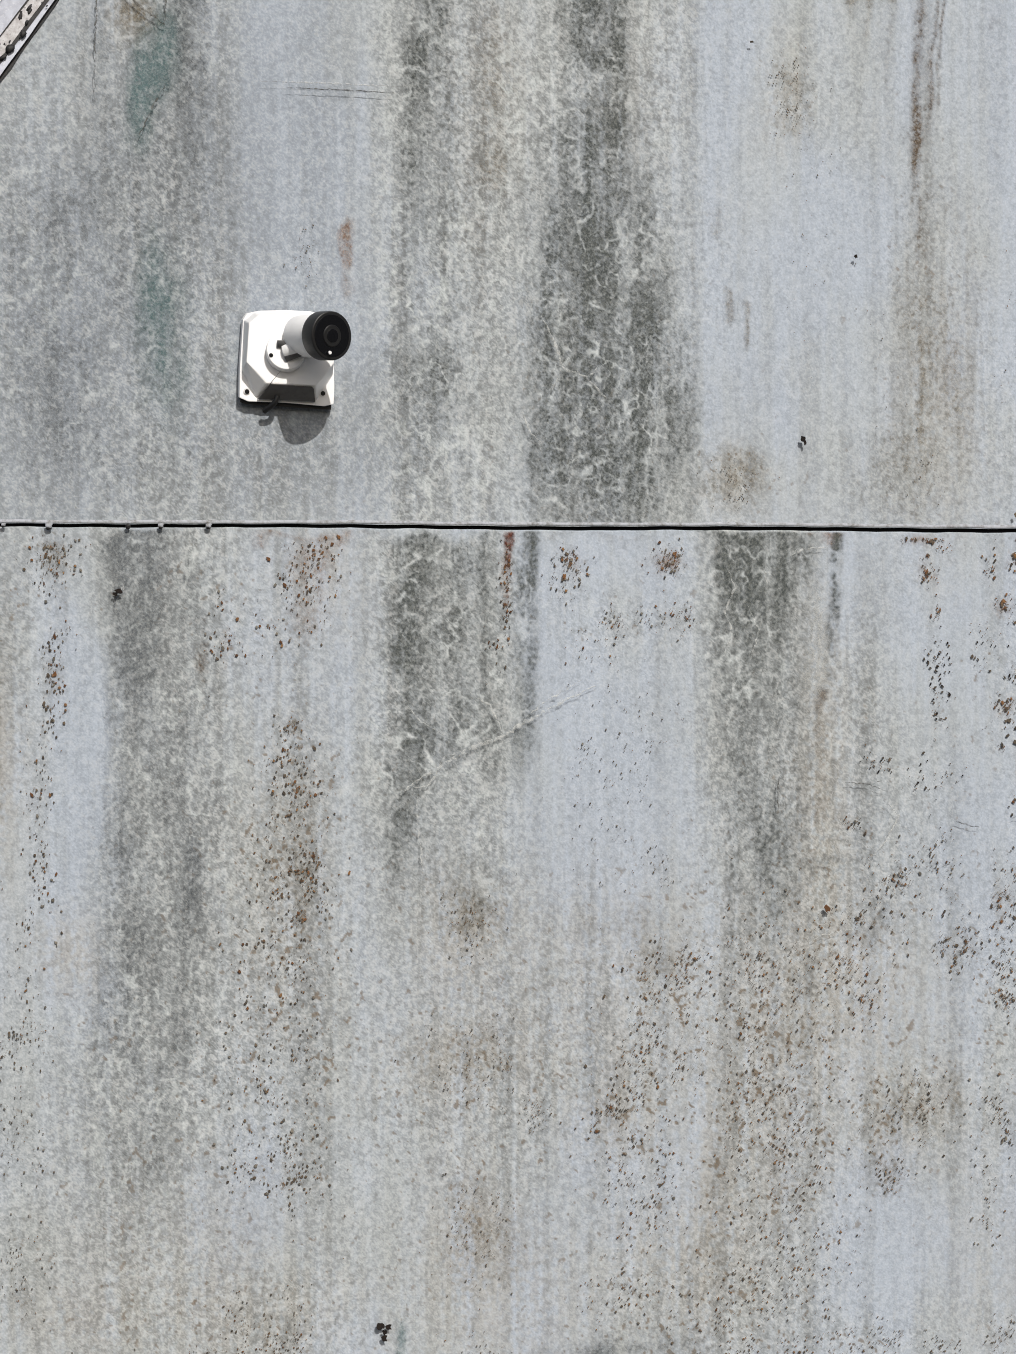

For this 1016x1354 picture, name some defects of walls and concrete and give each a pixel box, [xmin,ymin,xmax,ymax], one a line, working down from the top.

corrosion [8,534,91,951]
corrosion [199,535,351,671]
corrosion [485,532,514,673]
corrosion [572,684,684,806]
leakage [818,533,842,643]
corrosion [970,593,1016,750]
corrosion [195,714,353,1221]
corrosion [0,967,55,1195]
corrosion [419,752,1016,1354]
corrosion [0,1215,55,1331]